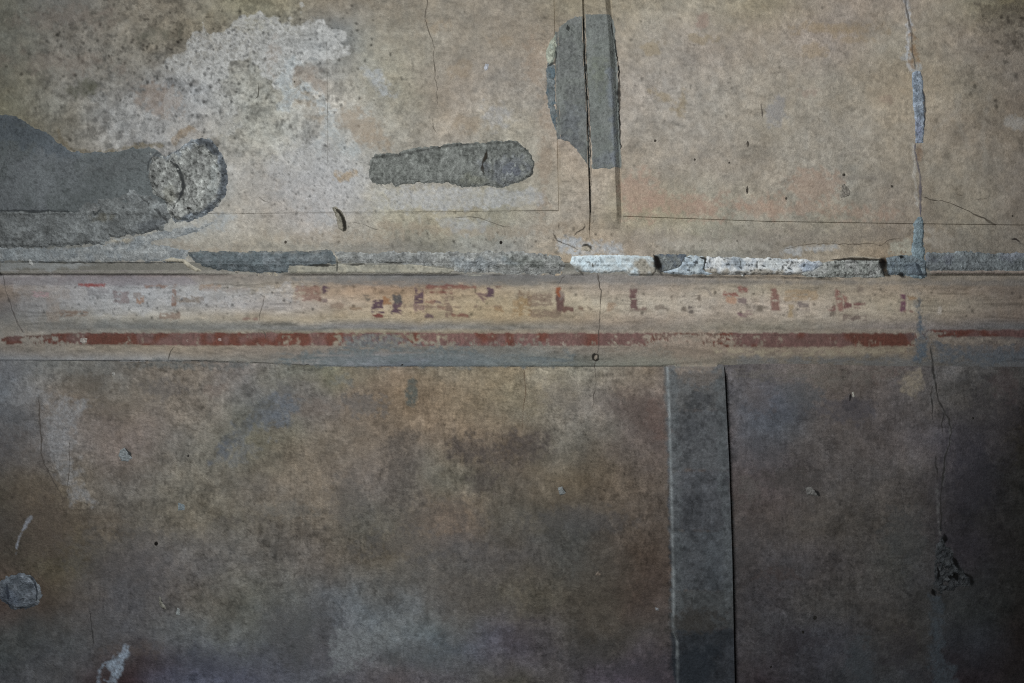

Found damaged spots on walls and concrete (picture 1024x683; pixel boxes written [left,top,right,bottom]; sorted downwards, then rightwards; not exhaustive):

crack [895,0,988,221]
spalling [570,244,885,278]
crack [929,349,953,537]
spalling [931,523,974,595]